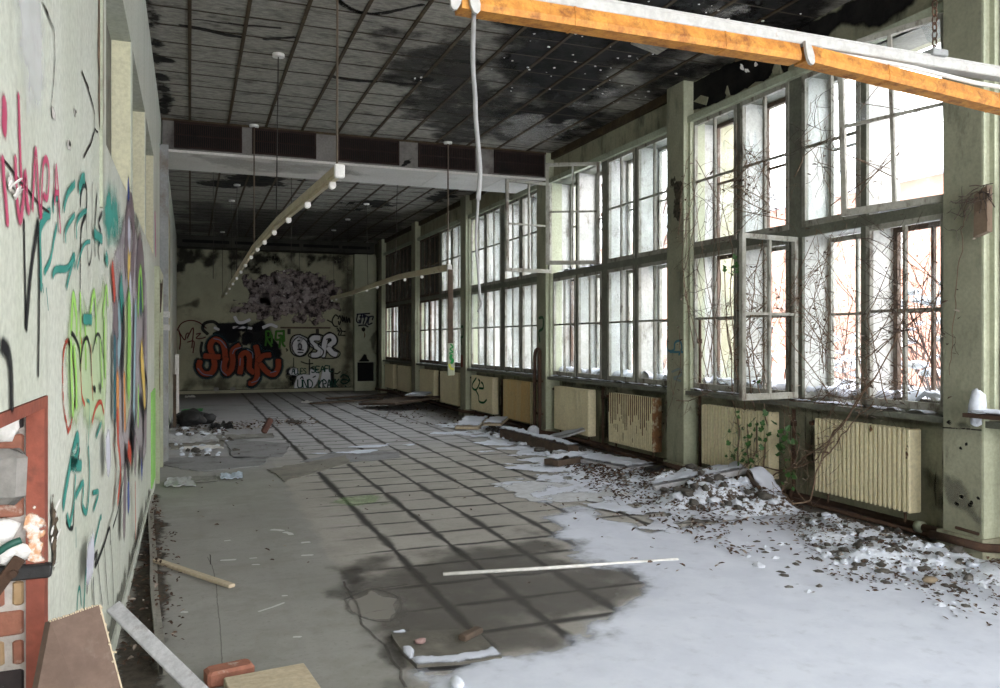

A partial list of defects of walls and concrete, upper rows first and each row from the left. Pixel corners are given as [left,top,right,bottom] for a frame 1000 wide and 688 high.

damp [329,75,417,85]
peeling [693,60,789,110]
damp [502,114,584,145]
peeling [222,269,343,326]
damp [333,541,631,649]